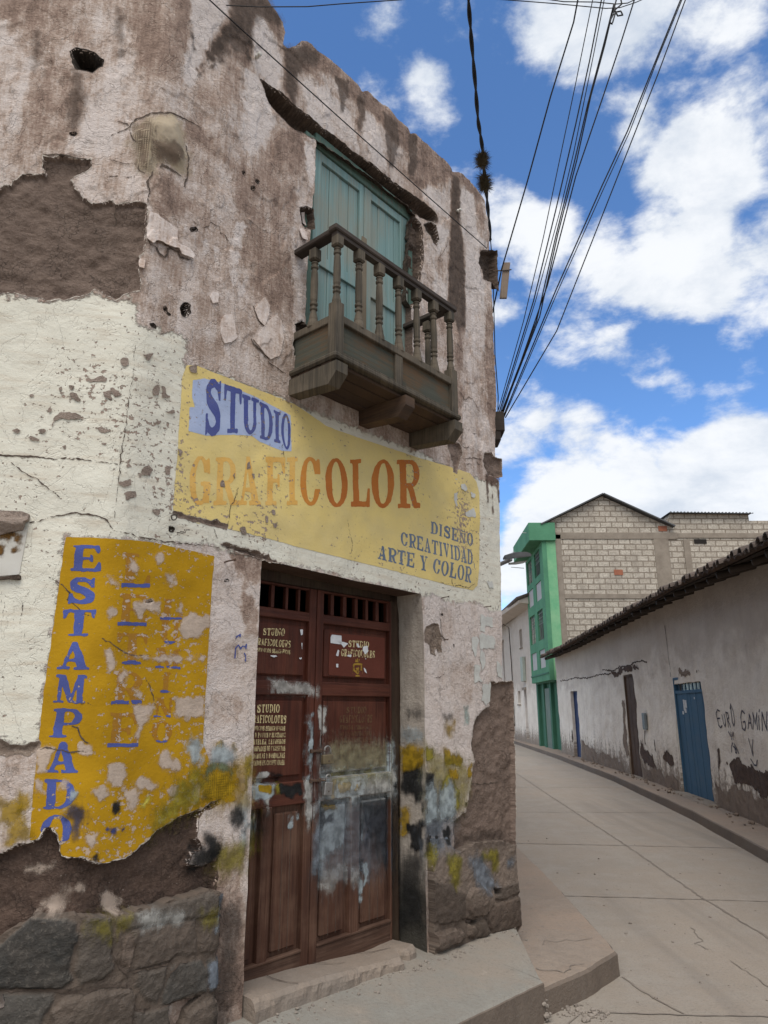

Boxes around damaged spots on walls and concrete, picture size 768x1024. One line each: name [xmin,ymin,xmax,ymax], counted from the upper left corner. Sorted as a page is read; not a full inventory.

spalling [69,47,104,73]
damp [190,0,280,76]
damp [284,46,318,105]
damp [335,76,365,130]
damp [382,111,417,175]
flaking render [0,155,198,302]
damp [448,176,466,329]
crack [0,345,261,560]
flaking render [483,452,503,478]
crack [560,631,671,681]
flaking render [453,680,516,849]
flaking render [0,784,221,936]